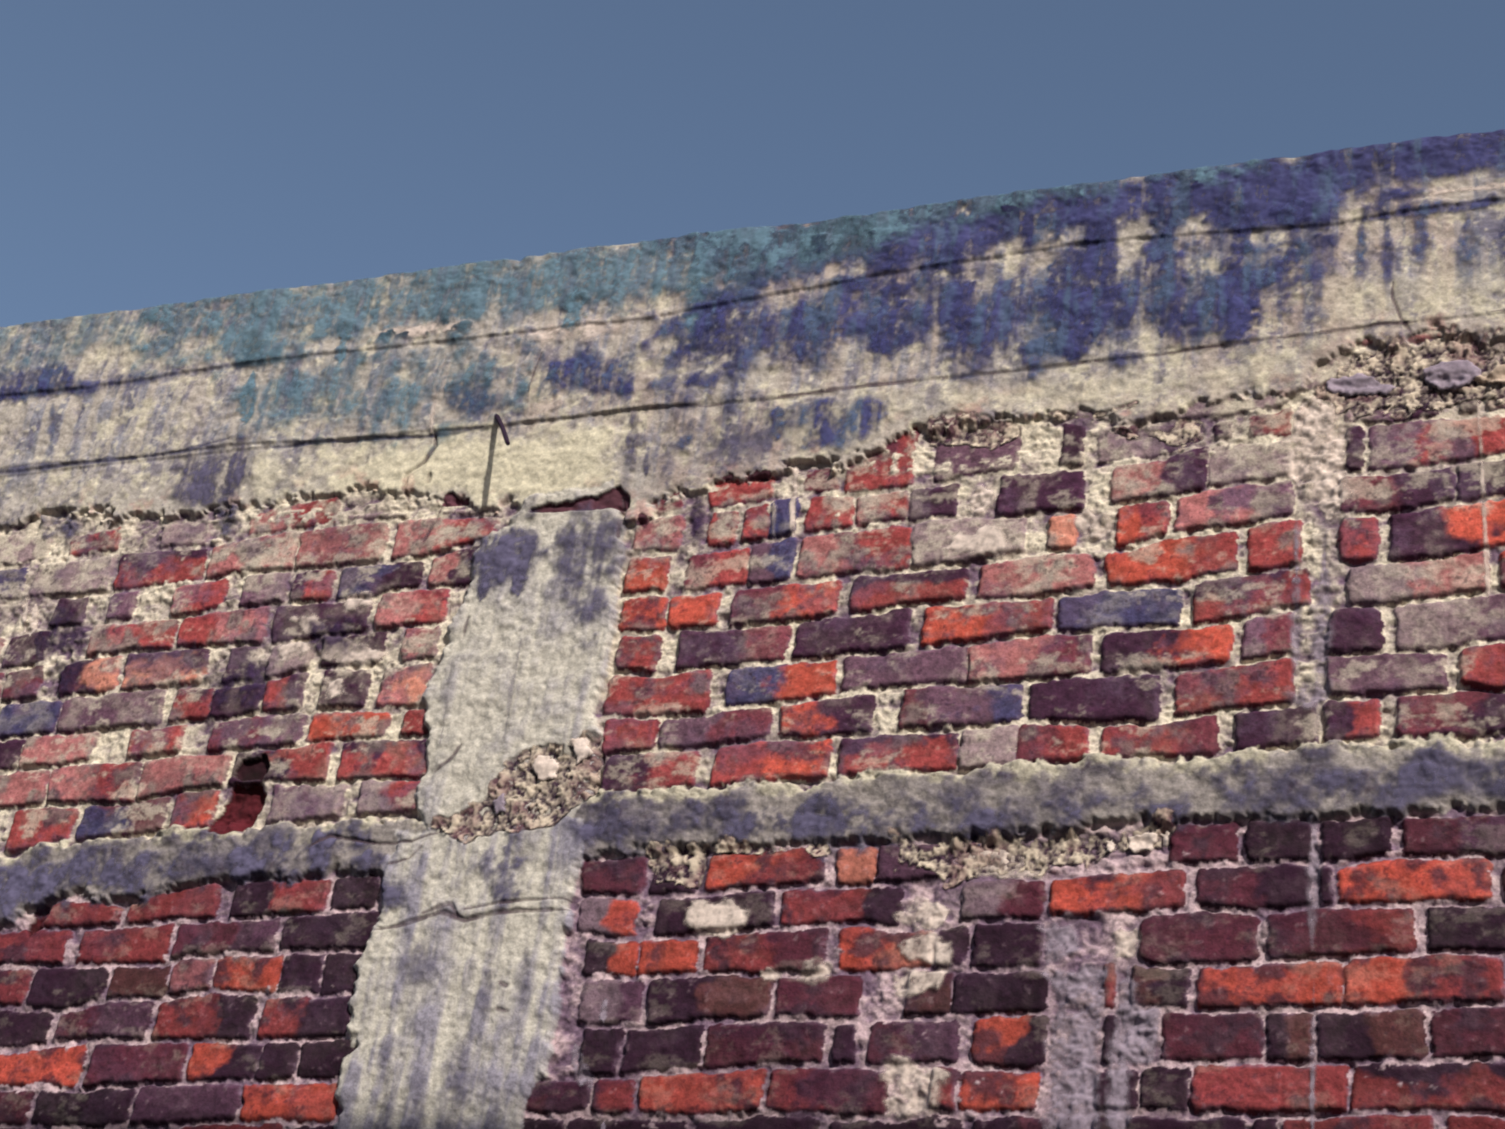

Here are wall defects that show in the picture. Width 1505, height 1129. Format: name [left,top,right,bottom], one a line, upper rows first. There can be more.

water stain [0,129,1505,540]
spalling [1316,323,1505,420]
crack [0,439,226,474]
crack [272,427,502,543]
water stain [472,513,626,620]
spalling [926,411,1020,450]
water stain [947,486,1010,556]
spalling [208,755,270,835]
spalling [431,730,603,844]
crack [376,898,572,930]
water stain [686,900,746,937]
water stain [895,898,951,996]